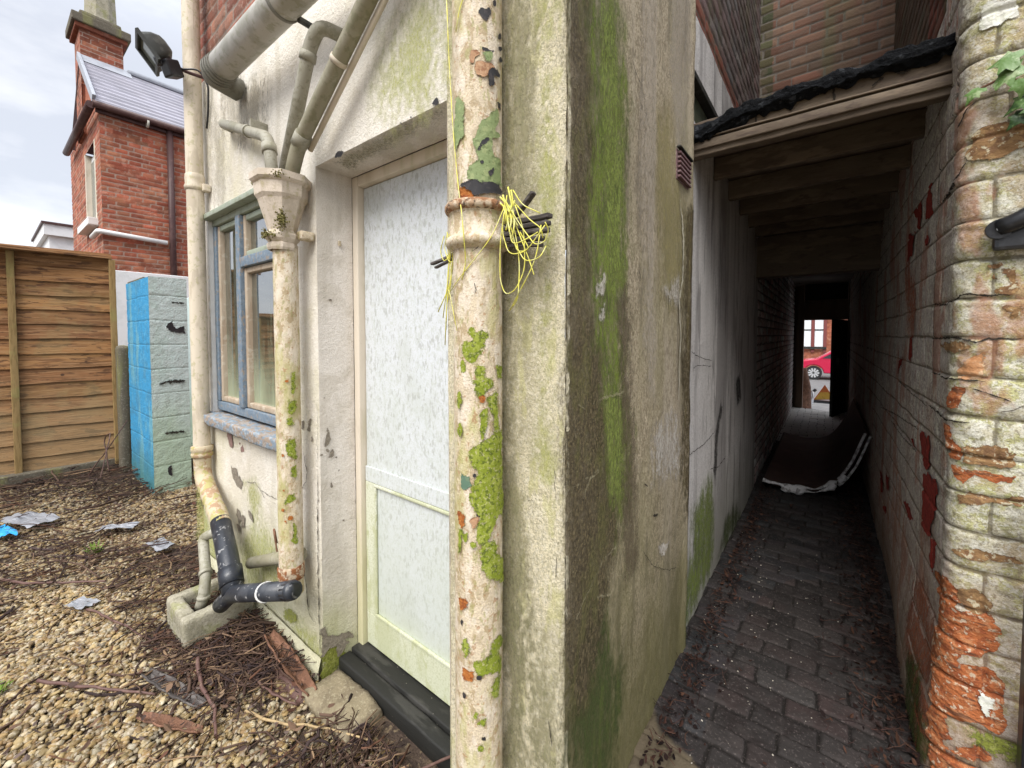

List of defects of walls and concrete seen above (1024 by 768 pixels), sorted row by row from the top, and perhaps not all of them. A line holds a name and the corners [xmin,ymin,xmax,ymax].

peeling [482,33,502,62]
peeling [454,96,502,196]
spalling [965,121,1024,161]
crack [881,66,1024,452]
spalling [987,262,1024,319]
water stain [559,0,639,730]
spalling [940,340,986,409]
spalling [231,466,243,489]
spalling [943,423,1024,507]
spalling [236,509,253,531]
spalling [903,431,1008,768]
spalling [320,626,354,657]